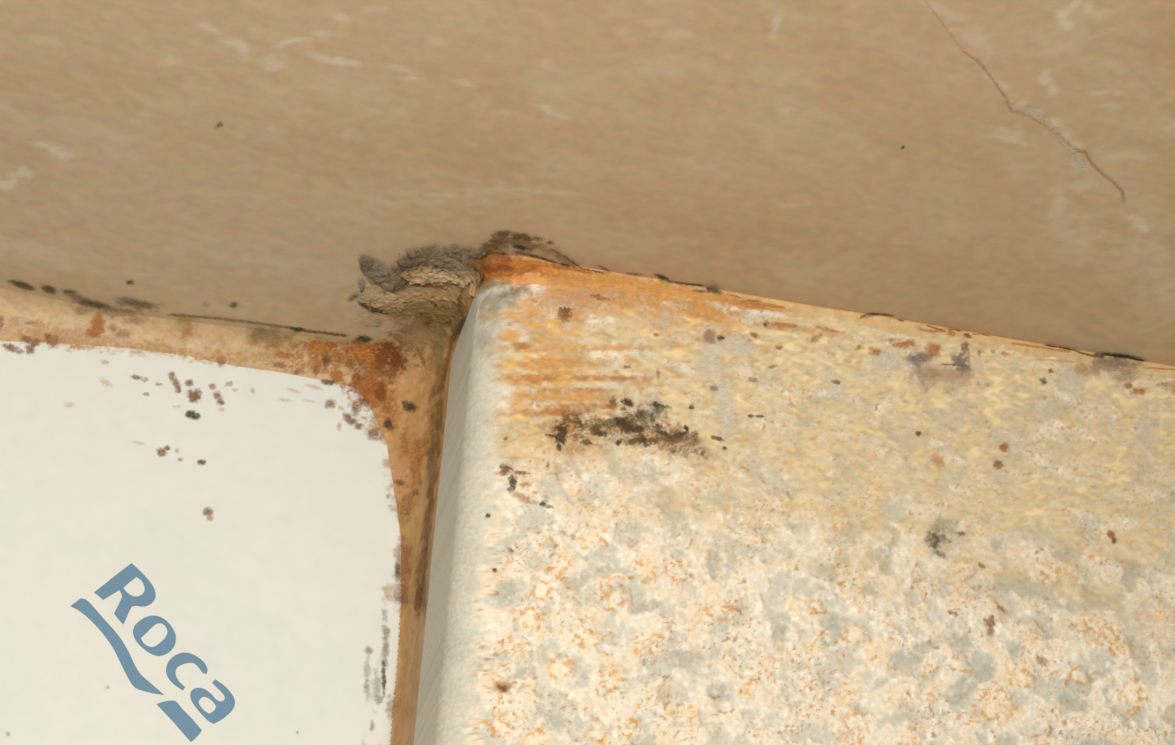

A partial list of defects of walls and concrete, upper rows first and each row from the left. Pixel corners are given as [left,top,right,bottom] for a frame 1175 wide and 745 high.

corrosion [408,267,458,289]
corrosion [473,253,611,287]
corrosion [271,331,423,439]
damp [483,232,1175,562]
corrosion [396,546,409,596]